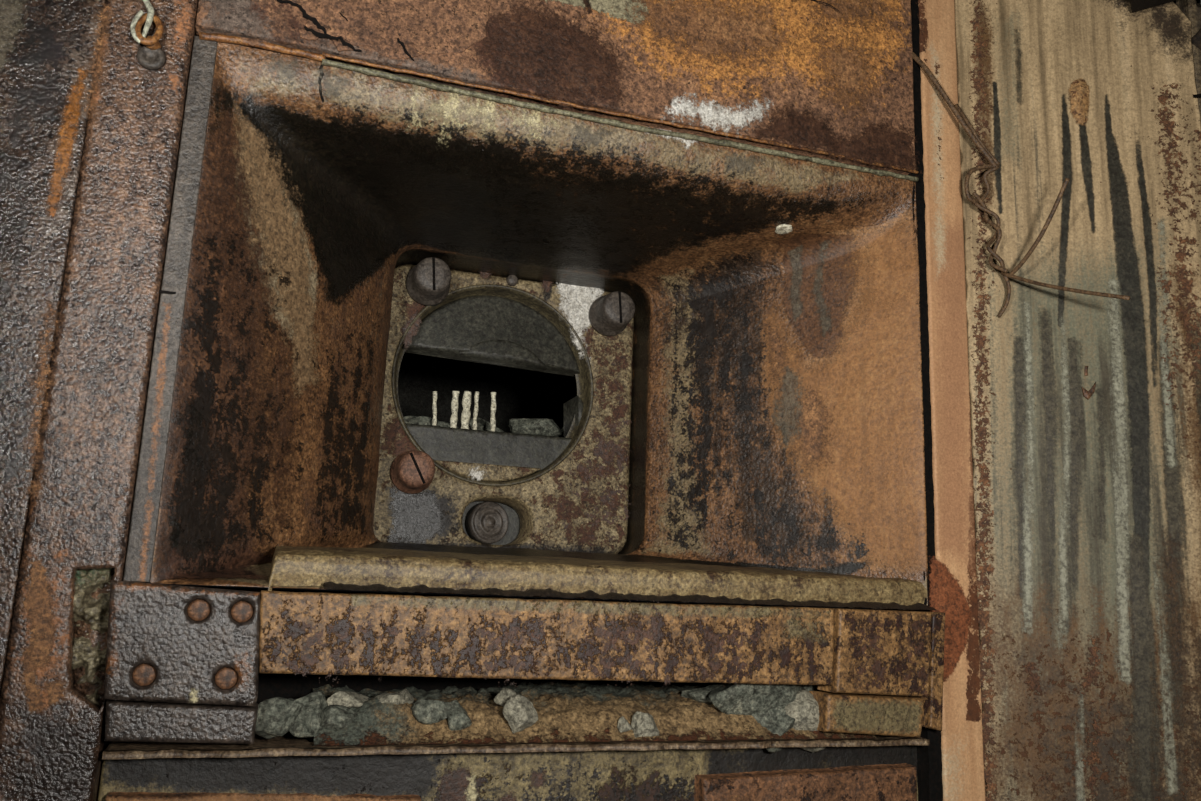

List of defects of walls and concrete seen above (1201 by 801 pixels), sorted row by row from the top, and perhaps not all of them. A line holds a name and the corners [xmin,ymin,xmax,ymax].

corrosion [23,293,58,496]
corrosion [47,3,111,217]
corrosion [155,83,445,581]
crack [277,0,362,102]
crack [397,38,414,61]
corrosion [275,0,633,114]
corrosion [544,0,1001,801]
water stain [993,82,1002,214]
water stain [1011,95,1187,801]
corrosion [1152,83,1201,407]
corrosion [107,753,461,801]
corrosion [467,753,715,801]